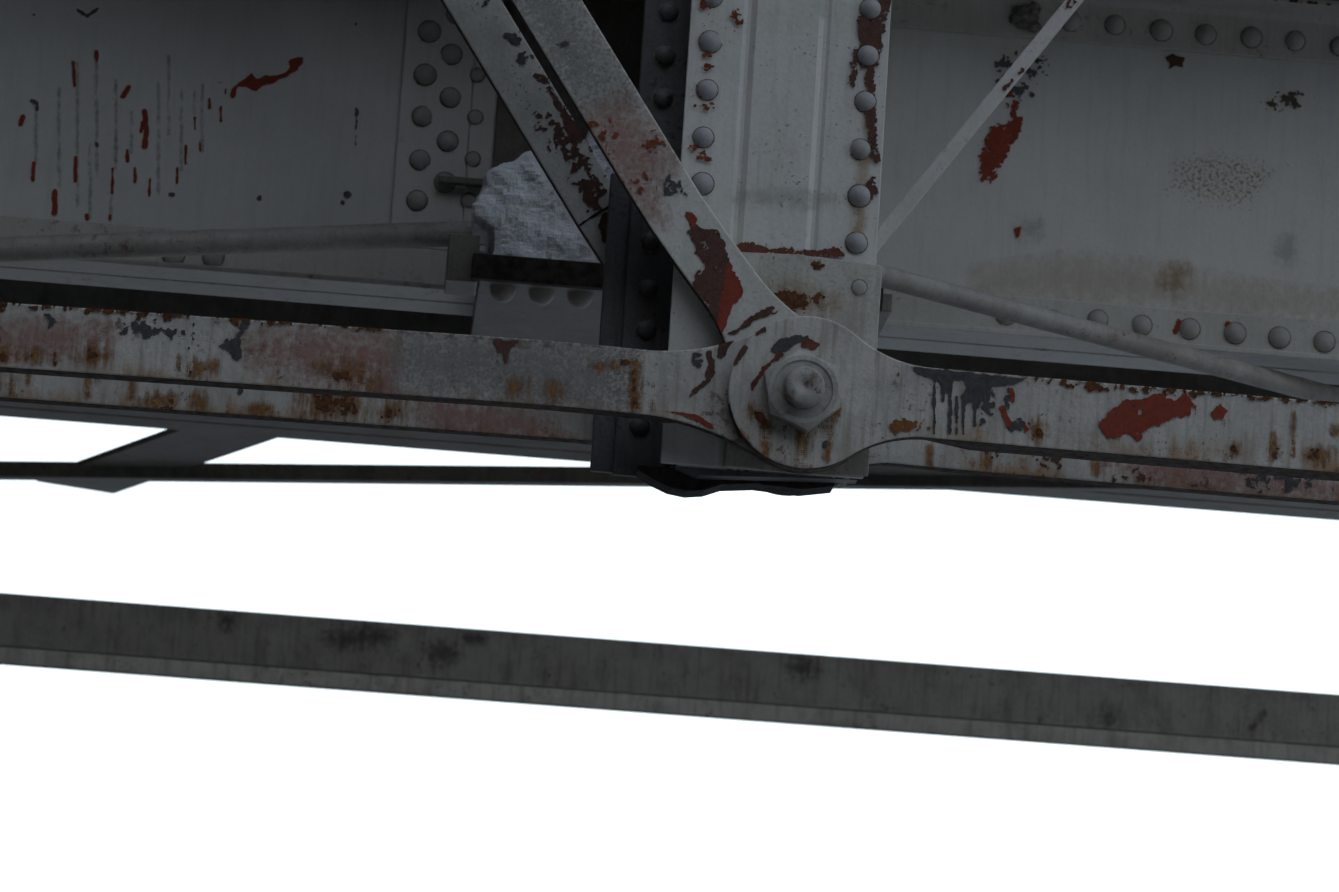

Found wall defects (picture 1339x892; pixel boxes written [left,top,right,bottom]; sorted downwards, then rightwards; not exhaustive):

peeling [176,57,303,184]
peeling [504,31,619,244]
peeling [847,0,891,200]
peeling [978,46,1049,184]
rust [0,302,190,321]
peeling [685,212,820,397]
rust [80,346,112,399]
rust [129,355,219,410]
rust [298,362,403,424]
rust [596,359,653,411]
peeling [1099,391,1228,442]
rust [1034,376,1339,464]